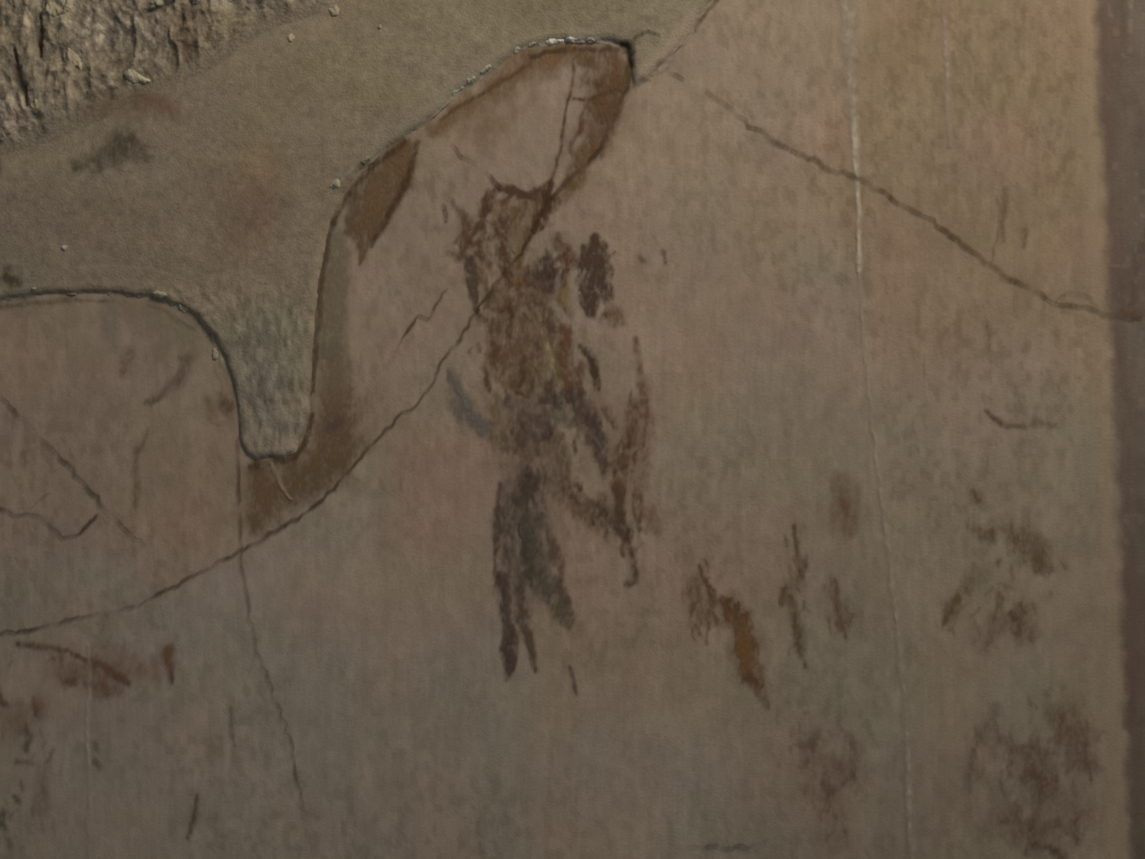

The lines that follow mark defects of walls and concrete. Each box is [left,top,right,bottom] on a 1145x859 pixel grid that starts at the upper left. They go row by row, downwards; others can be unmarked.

flaking render [0,0,342,156]
peeling [514,37,595,53]
crack [516,231,534,259]
crack [935,222,977,253]
crack [439,290,493,366]
crack [59,457,129,538]
crack [223,413,401,560]
crack [2,626,39,634]
rust [689,565,763,688]